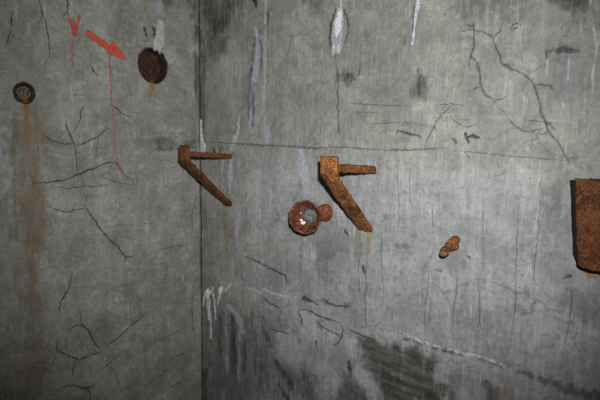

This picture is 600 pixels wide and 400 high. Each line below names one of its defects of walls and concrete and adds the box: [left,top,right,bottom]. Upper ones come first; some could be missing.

damp [329,0,349,54]
crack [462,22,569,162]
crack [42,107,138,261]
crack [52,311,142,399]
damp [203,284,232,339]
crack [298,257,377,346]
damp [359,338,453,400]